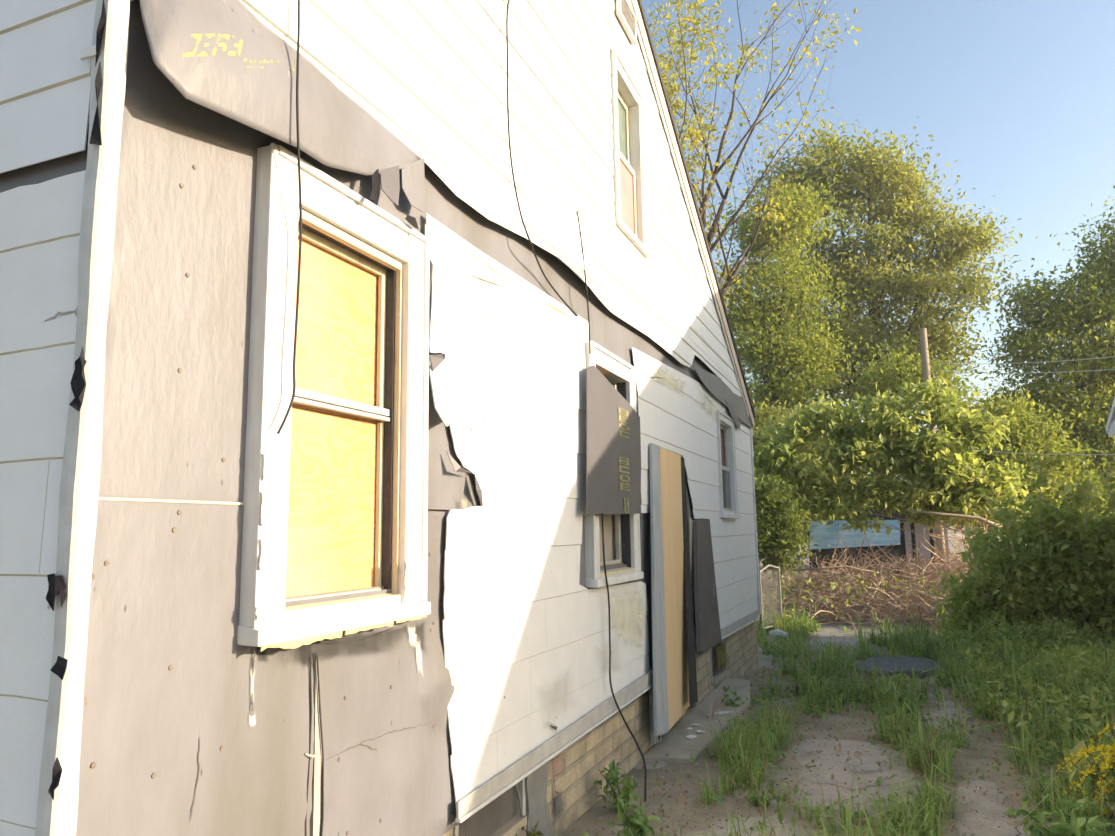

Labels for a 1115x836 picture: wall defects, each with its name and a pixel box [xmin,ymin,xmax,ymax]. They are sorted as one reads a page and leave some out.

peeling [260,451,268,571]
water stain [611,594,643,643]
crack [328,722,434,759]